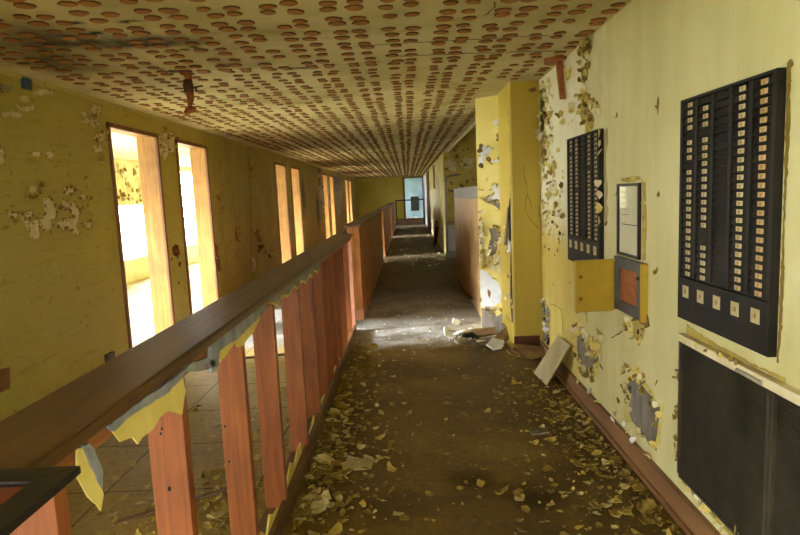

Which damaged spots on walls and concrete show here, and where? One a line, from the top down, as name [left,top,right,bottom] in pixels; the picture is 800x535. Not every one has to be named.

peeling [2,181,93,241]
flaking render [444,119,513,334]
peeling [528,37,616,262]
peeling [286,290,467,535]
peeling [478,357,680,535]
flaking render [571,312,604,403]
flaking render [610,315,678,459]